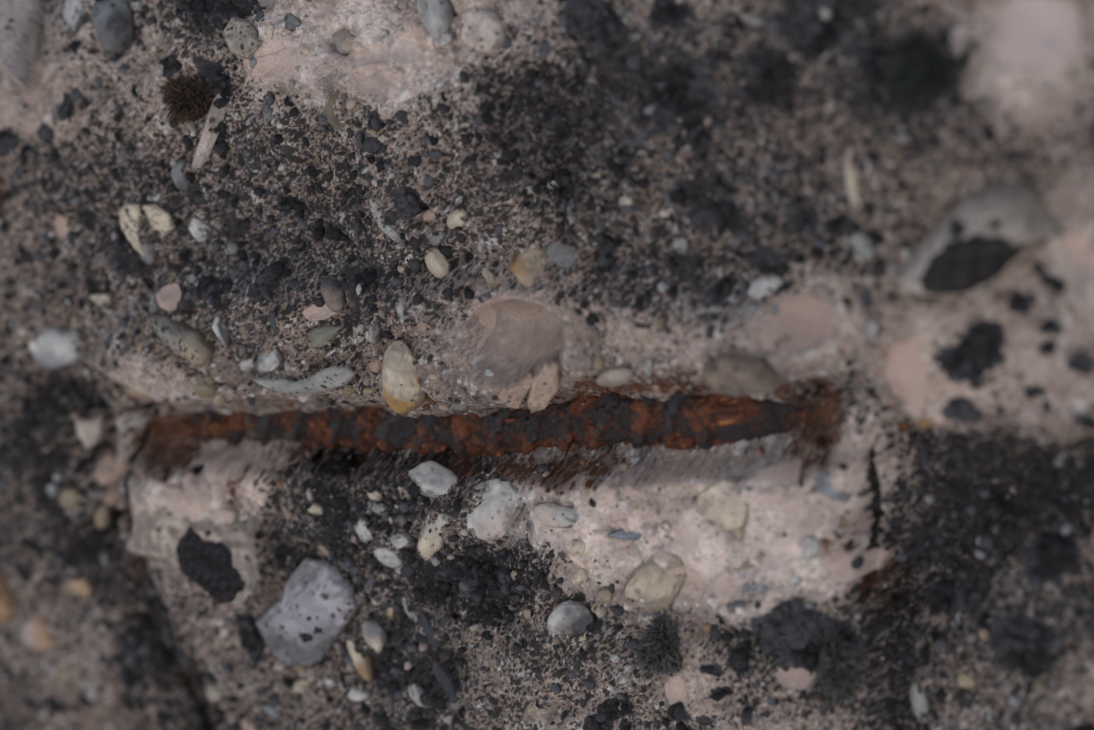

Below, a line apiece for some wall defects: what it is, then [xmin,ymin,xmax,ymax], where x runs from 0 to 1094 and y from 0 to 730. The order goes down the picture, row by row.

rust [282,437,625,495]
spalling [129,391,815,562]
spalling [473,296,606,398]
rust [550,372,710,403]
rust [766,378,843,479]
spalling [510,450,894,624]